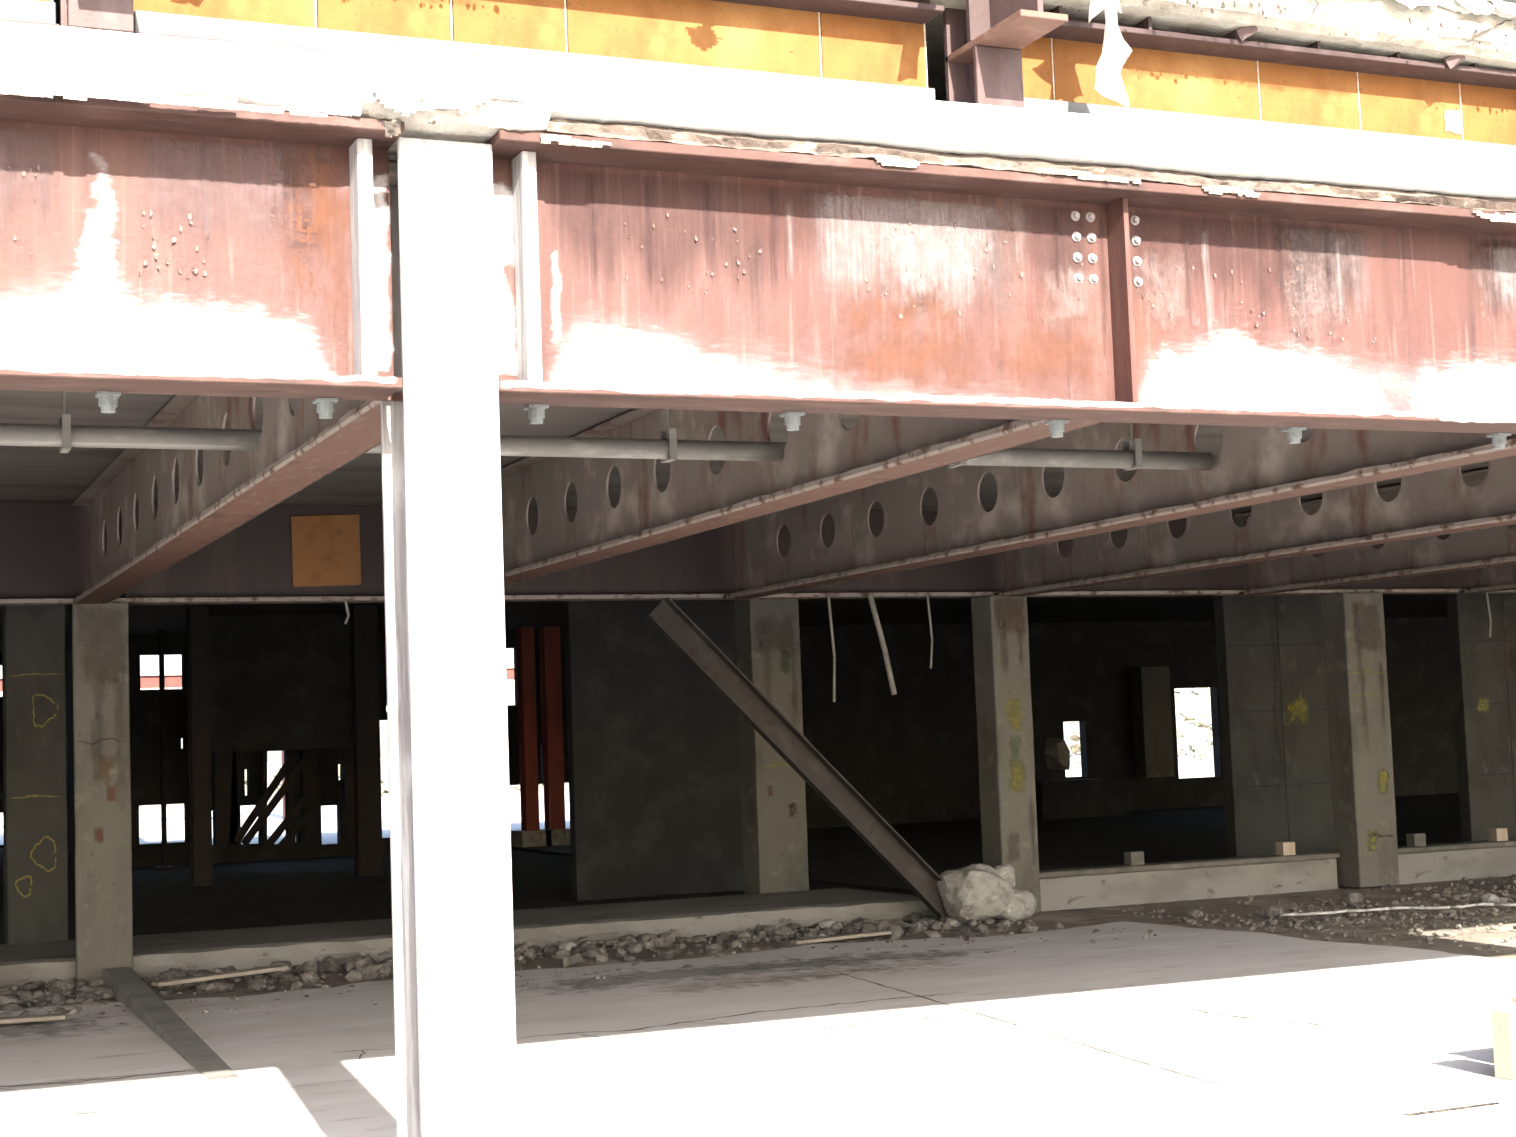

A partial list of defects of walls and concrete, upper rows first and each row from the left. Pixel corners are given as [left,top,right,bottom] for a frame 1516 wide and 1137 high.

spalling [0,66,352,117]
spalling [372,52,527,138]
damp [151,139,284,228]
damp [0,173,396,383]
damp [502,252,1516,423]